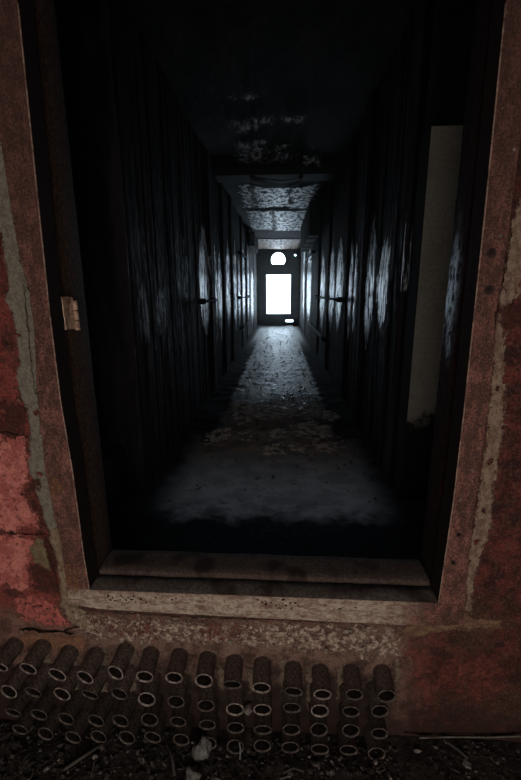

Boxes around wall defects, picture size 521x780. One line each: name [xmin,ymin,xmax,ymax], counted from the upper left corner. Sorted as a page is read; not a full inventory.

crack [19,605,337,635]
peeling [0,138,521,712]